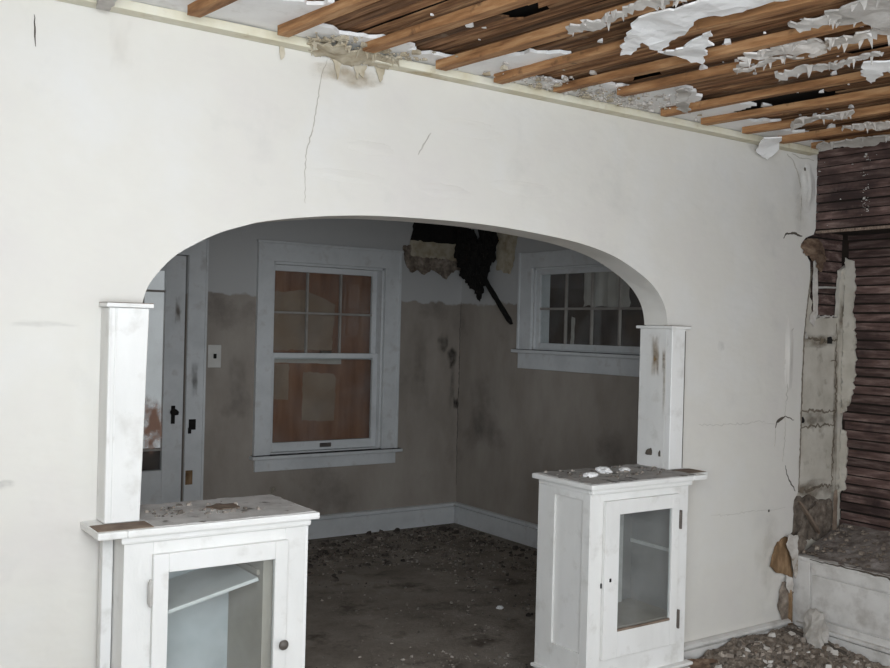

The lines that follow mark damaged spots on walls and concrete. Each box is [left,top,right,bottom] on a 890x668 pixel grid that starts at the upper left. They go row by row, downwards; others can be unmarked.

peeling [96,0,117,11]
spalling [306,32,367,49]
peeling [565,0,787,64]
peeling [733,0,890,84]
flaking render [482,62,671,113]
crack [304,62,327,198]
peeling [756,136,782,160]
peeling [790,109,890,152]
flaking render [403,222,461,279]
flaking render [496,232,518,274]
flaking render [802,229,843,318]
flaking render [777,489,890,625]